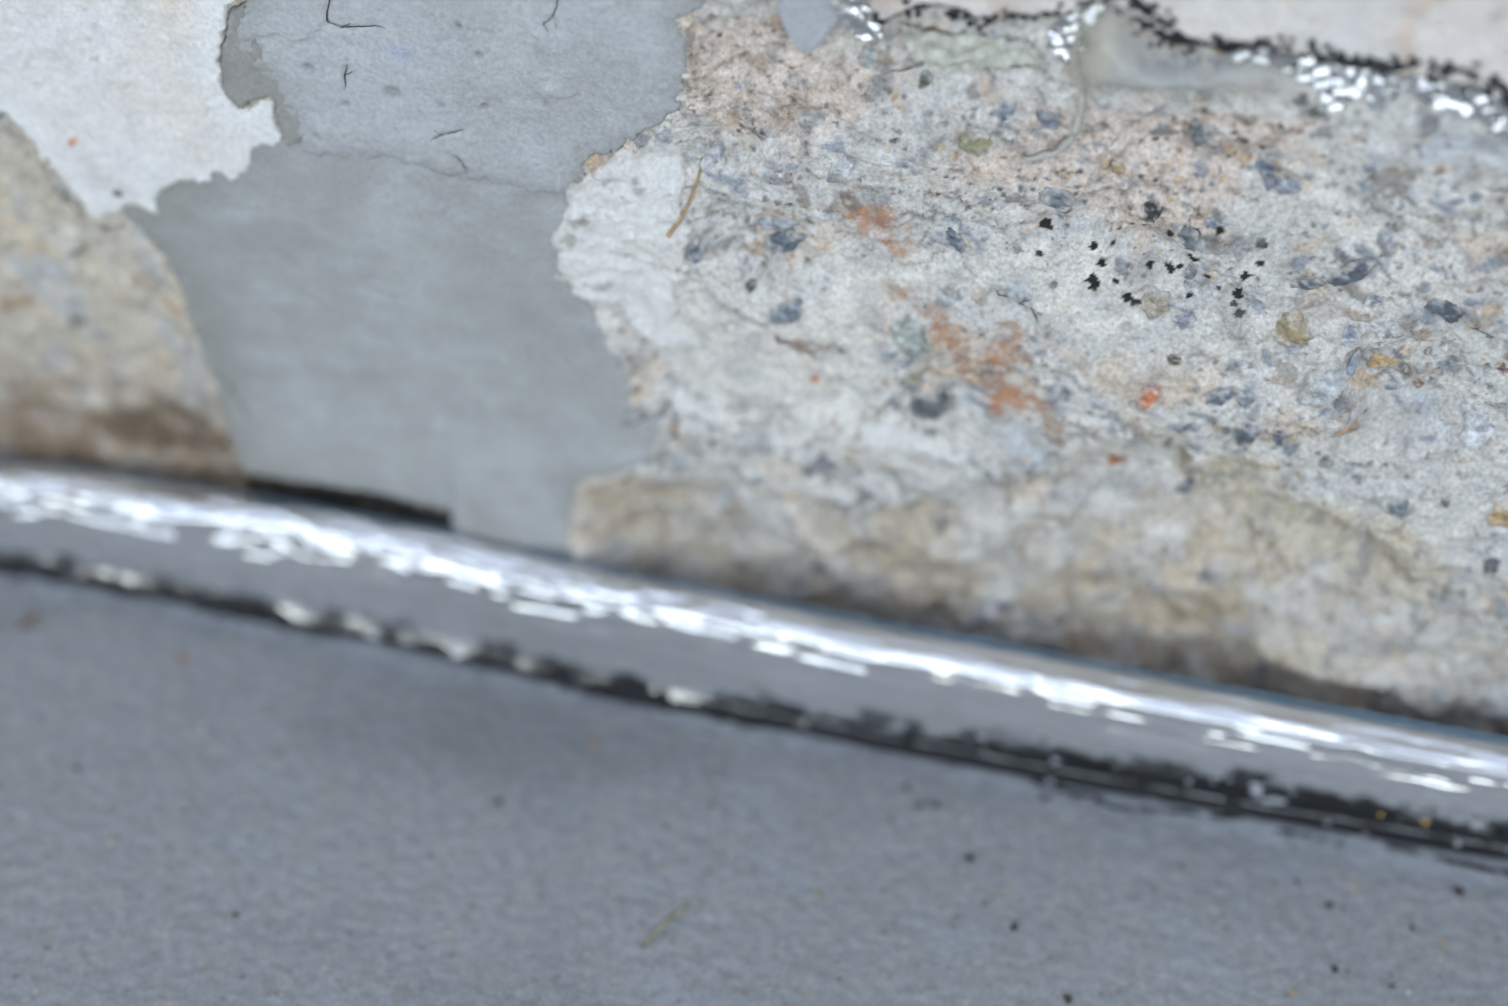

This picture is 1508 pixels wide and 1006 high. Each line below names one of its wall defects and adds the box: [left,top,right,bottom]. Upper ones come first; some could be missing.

spalling [0,0,453,530]
spalling [551,0,1508,738]